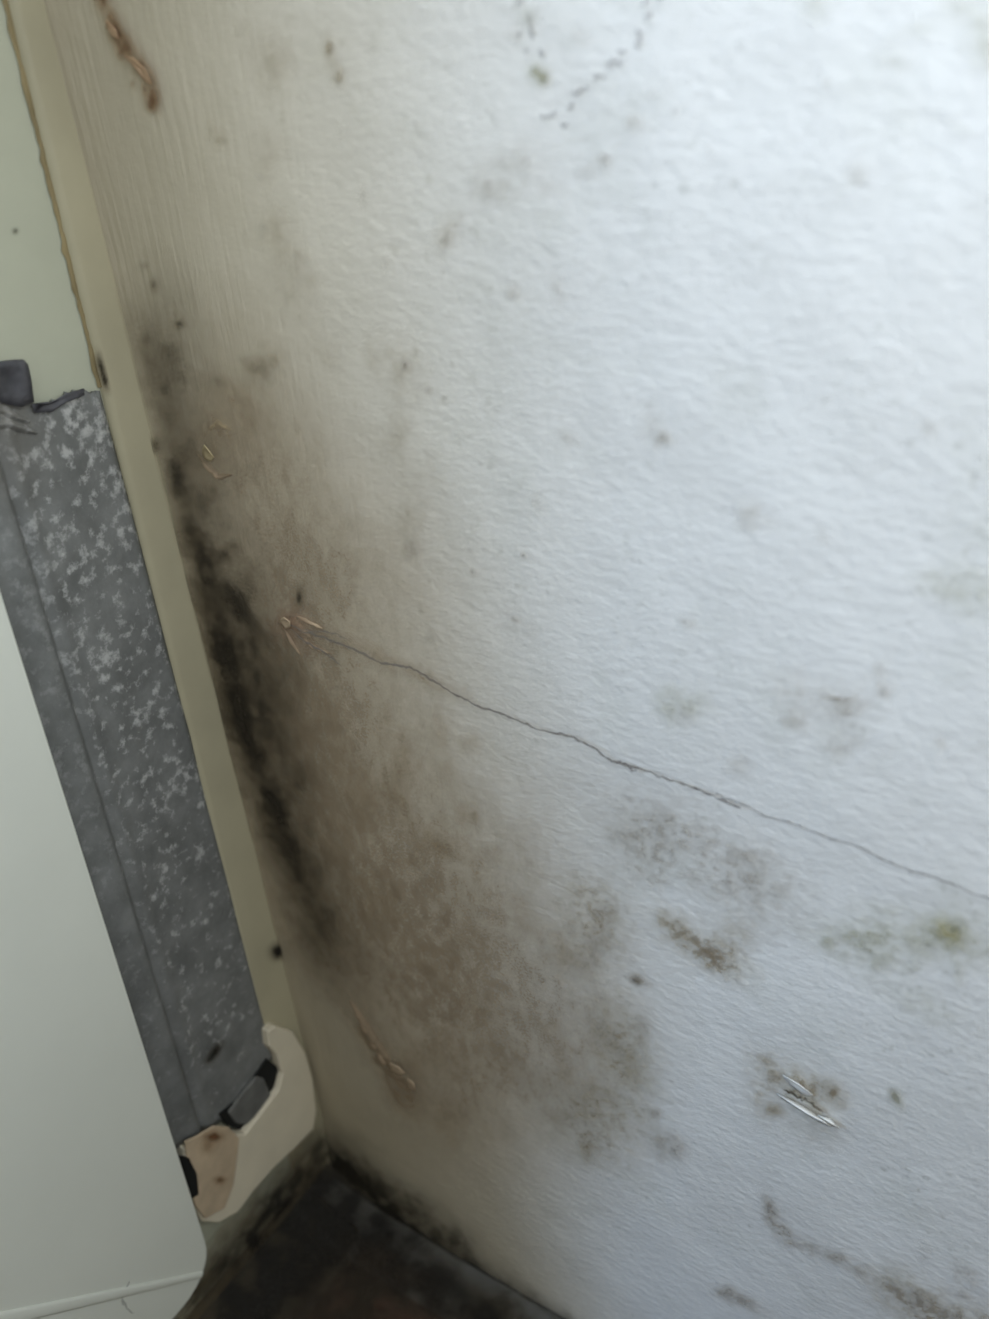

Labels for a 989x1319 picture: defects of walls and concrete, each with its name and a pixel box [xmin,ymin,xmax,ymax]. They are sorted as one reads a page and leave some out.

corrosion [101,0,157,109]
damp [168,415,587,1113]
crack [290,624,989,899]
damp [666,921,734,973]